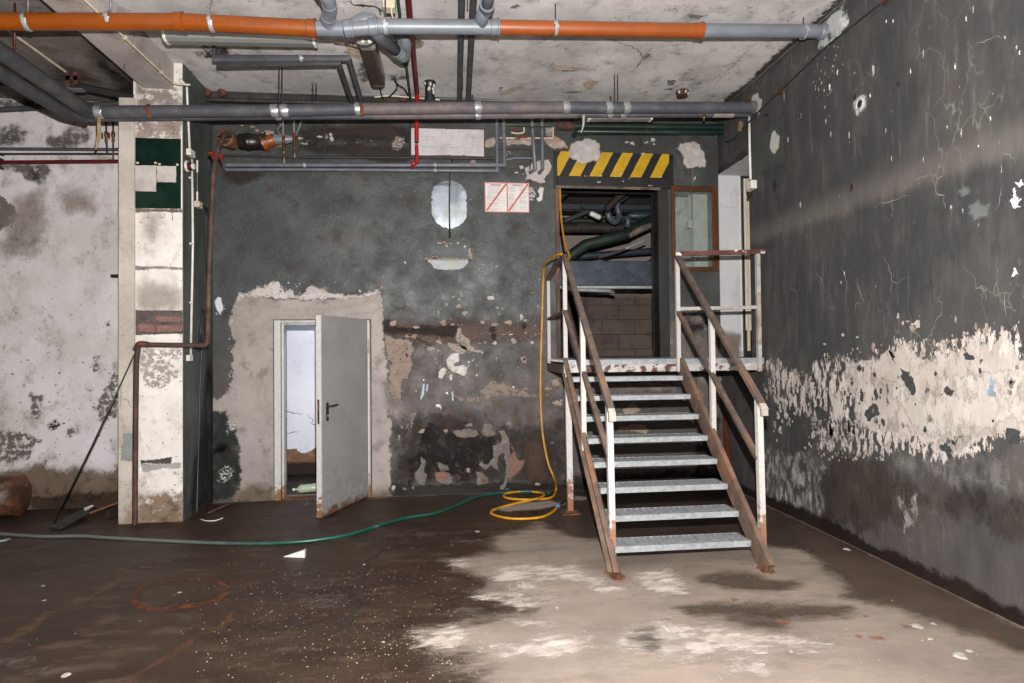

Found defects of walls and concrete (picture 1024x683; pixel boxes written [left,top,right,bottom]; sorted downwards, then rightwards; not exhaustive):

spalling [853,95,866,116]
flaking render [213,279,563,501]
spalling [616,402,649,434]
leakage [670,306,741,358]
peeling [763,313,1024,491]
leakage [0,365,1024,683]